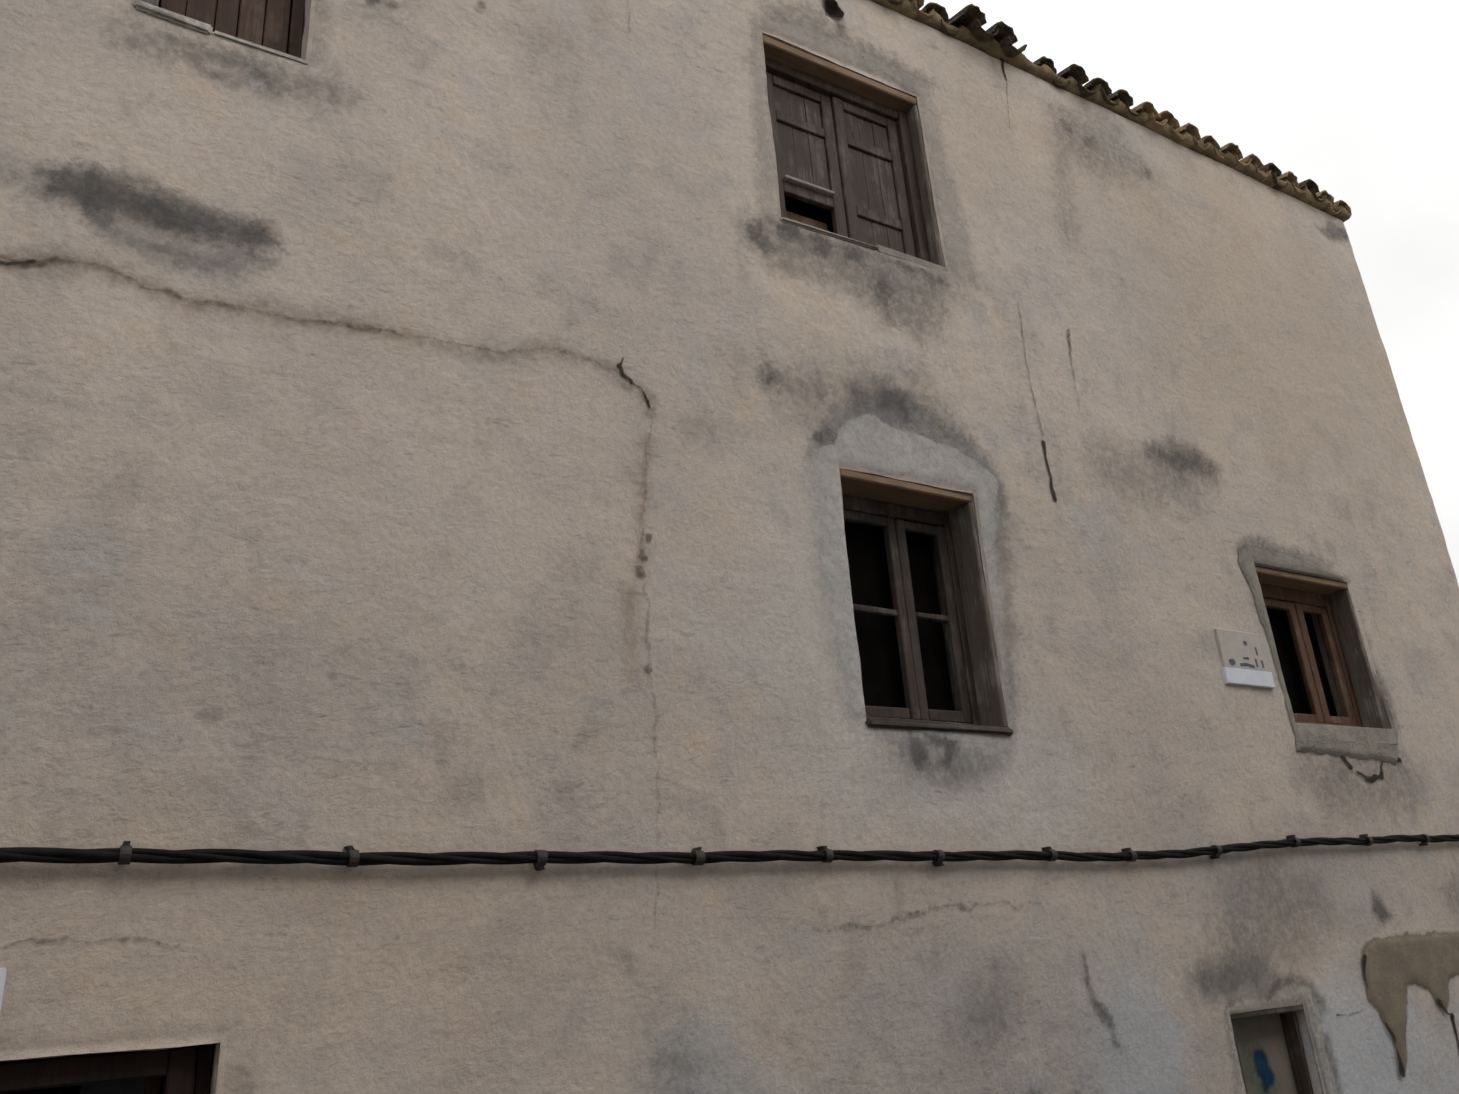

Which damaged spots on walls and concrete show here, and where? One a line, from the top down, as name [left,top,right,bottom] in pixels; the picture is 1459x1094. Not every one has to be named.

leakage [47,169,277,265]
crack [0,257,115,271]
crack [617,358,650,408]
crack [1018,309,1057,502]
crack [637,534,652,576]
crack [1085,960,1112,1025]